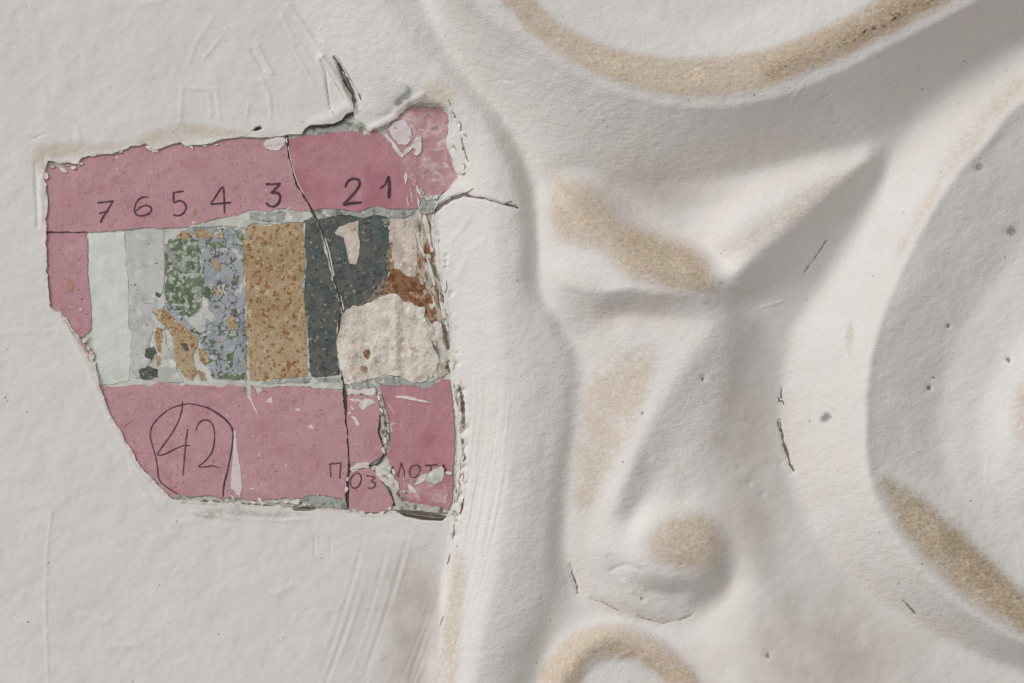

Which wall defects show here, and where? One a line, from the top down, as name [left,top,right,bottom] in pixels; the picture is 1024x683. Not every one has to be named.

crack [286,56,361,338]
crack [433,100,519,214]
peeling [39,98,466,539]
crack [341,371,395,509]
crack [777,388,794,471]